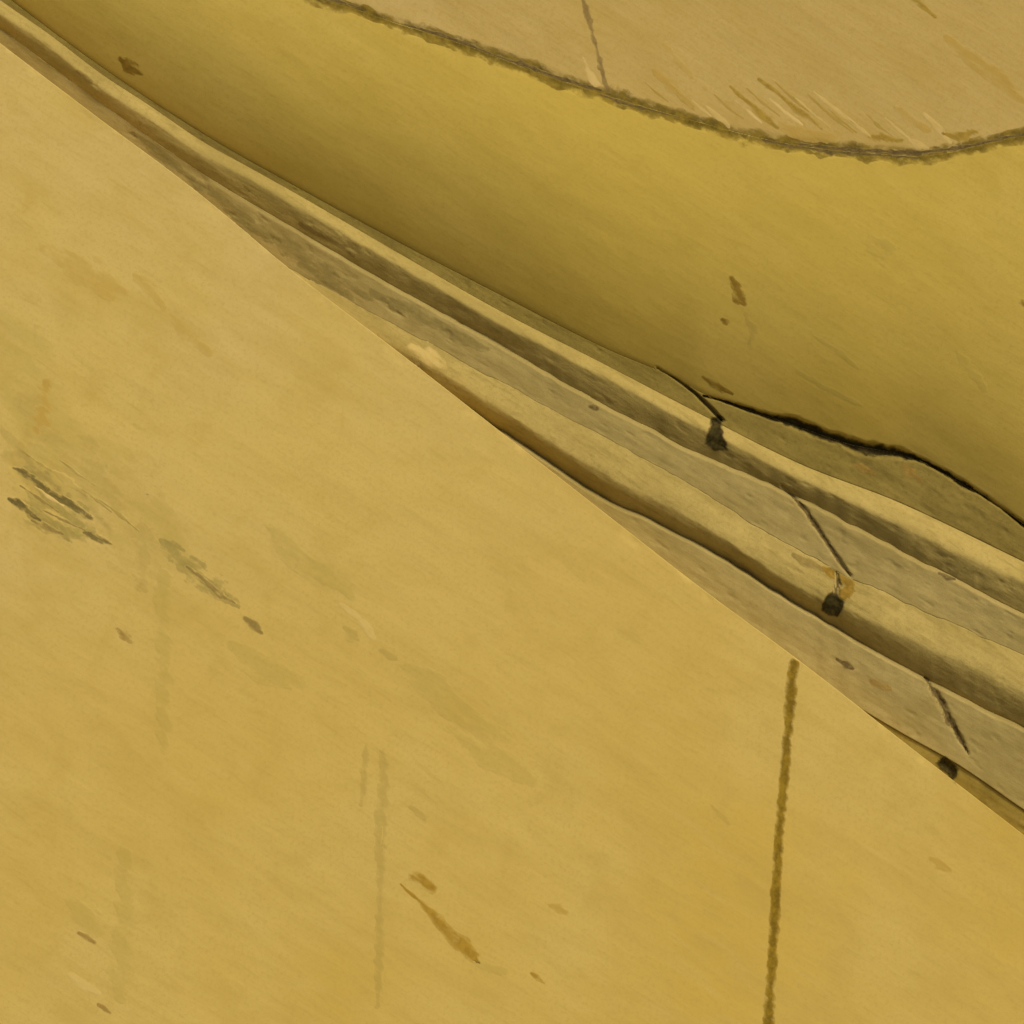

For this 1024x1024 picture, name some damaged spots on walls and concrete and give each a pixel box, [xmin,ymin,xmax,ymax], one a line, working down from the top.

spalling [582,57,601,87]
crack [301,0,1024,167]
flaking render [645,77,980,150]
crack [670,376,1024,526]
leakage [0,290,192,755]
crack [784,491,852,597]
rust [791,552,856,601]
crack [922,676,970,754]
leakage [64,844,138,1014]